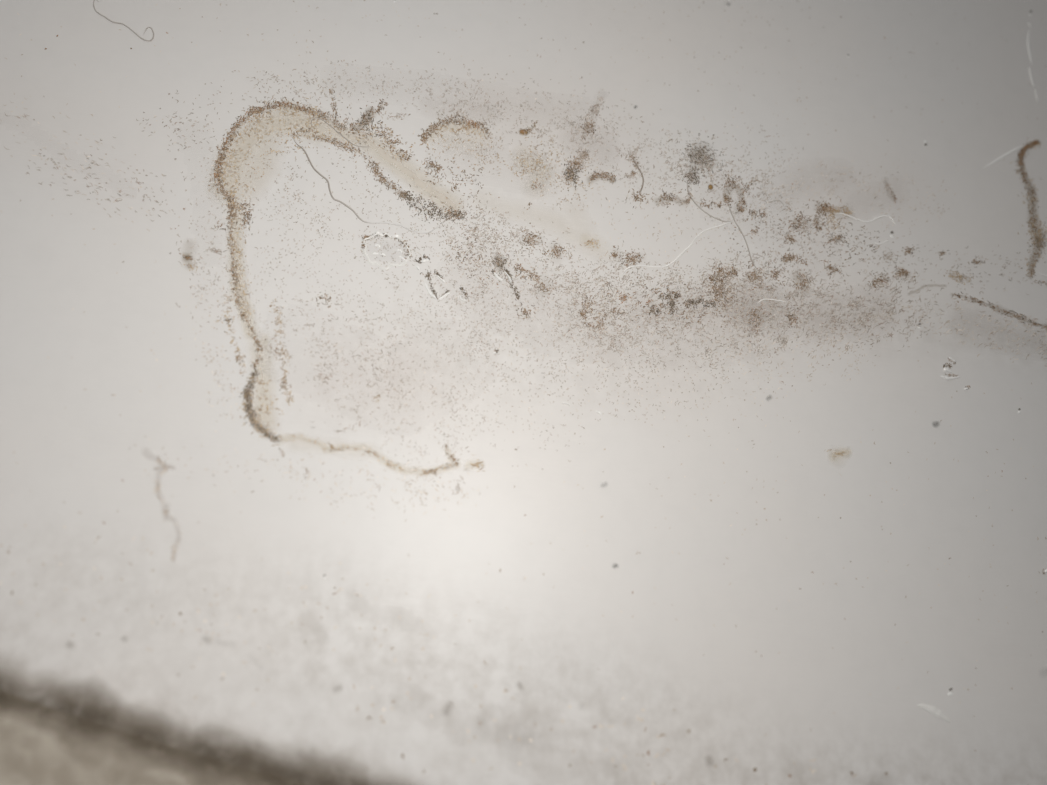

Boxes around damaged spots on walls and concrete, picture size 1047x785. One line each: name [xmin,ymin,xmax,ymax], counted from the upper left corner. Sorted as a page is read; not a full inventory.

water stain [1,30,1047,524]
water stain [0,692,338,785]